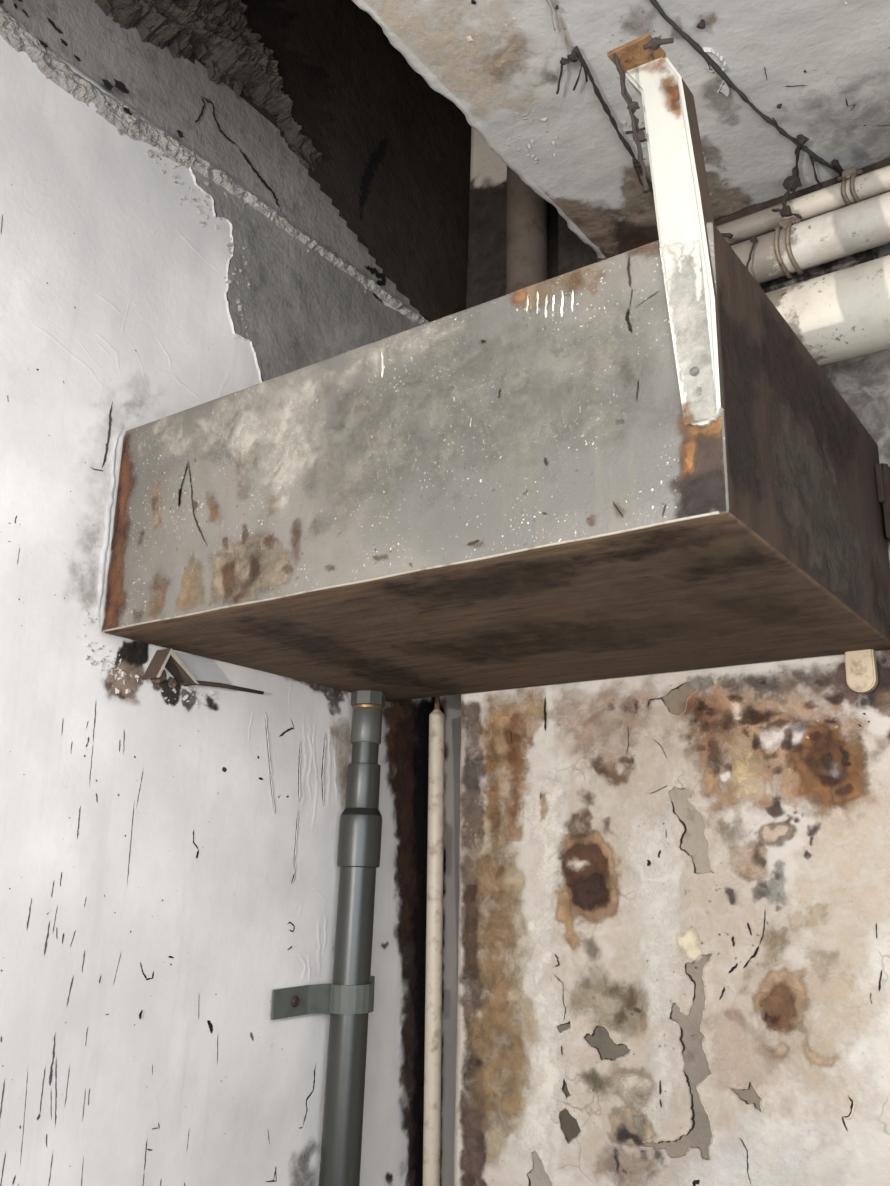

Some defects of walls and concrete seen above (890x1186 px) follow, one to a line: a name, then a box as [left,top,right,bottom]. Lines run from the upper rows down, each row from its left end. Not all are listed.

spalling [0,0,429,383]
crack [91,401,113,471]
water stain [689,663,843,720]
efflorescence [760,721,804,750]
crack [265,712,327,884]
water stain [460,702,565,1186]
peeling [583,1025,635,1061]
peeling [635,926,719,1160]
crack [300,1064,316,1129]
peeling [559,1077,582,1144]
water stain [589,1033,677,1186]
crack [842,1093,857,1132]